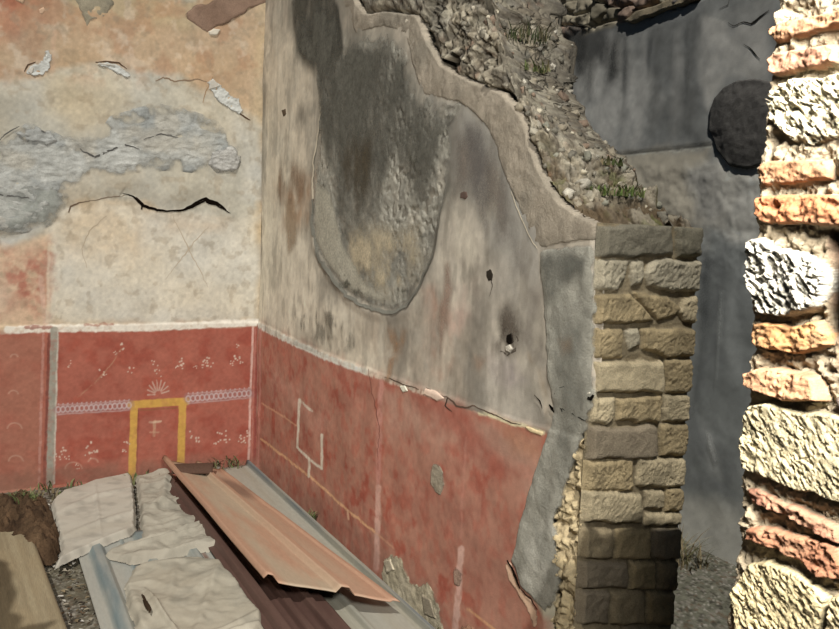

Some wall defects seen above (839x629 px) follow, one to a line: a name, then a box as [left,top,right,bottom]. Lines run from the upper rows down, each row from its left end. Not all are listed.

flaking render [76,0,114,25]
flaking render [187,0,266,36]
flaking render [0,105,241,233]
flaking render [298,8,461,314]
crack [68,193,230,287]
crack [368,369,543,457]
crack [534,387,595,421]
flaking render [381,554,444,629]
flaking render [505,560,537,627]